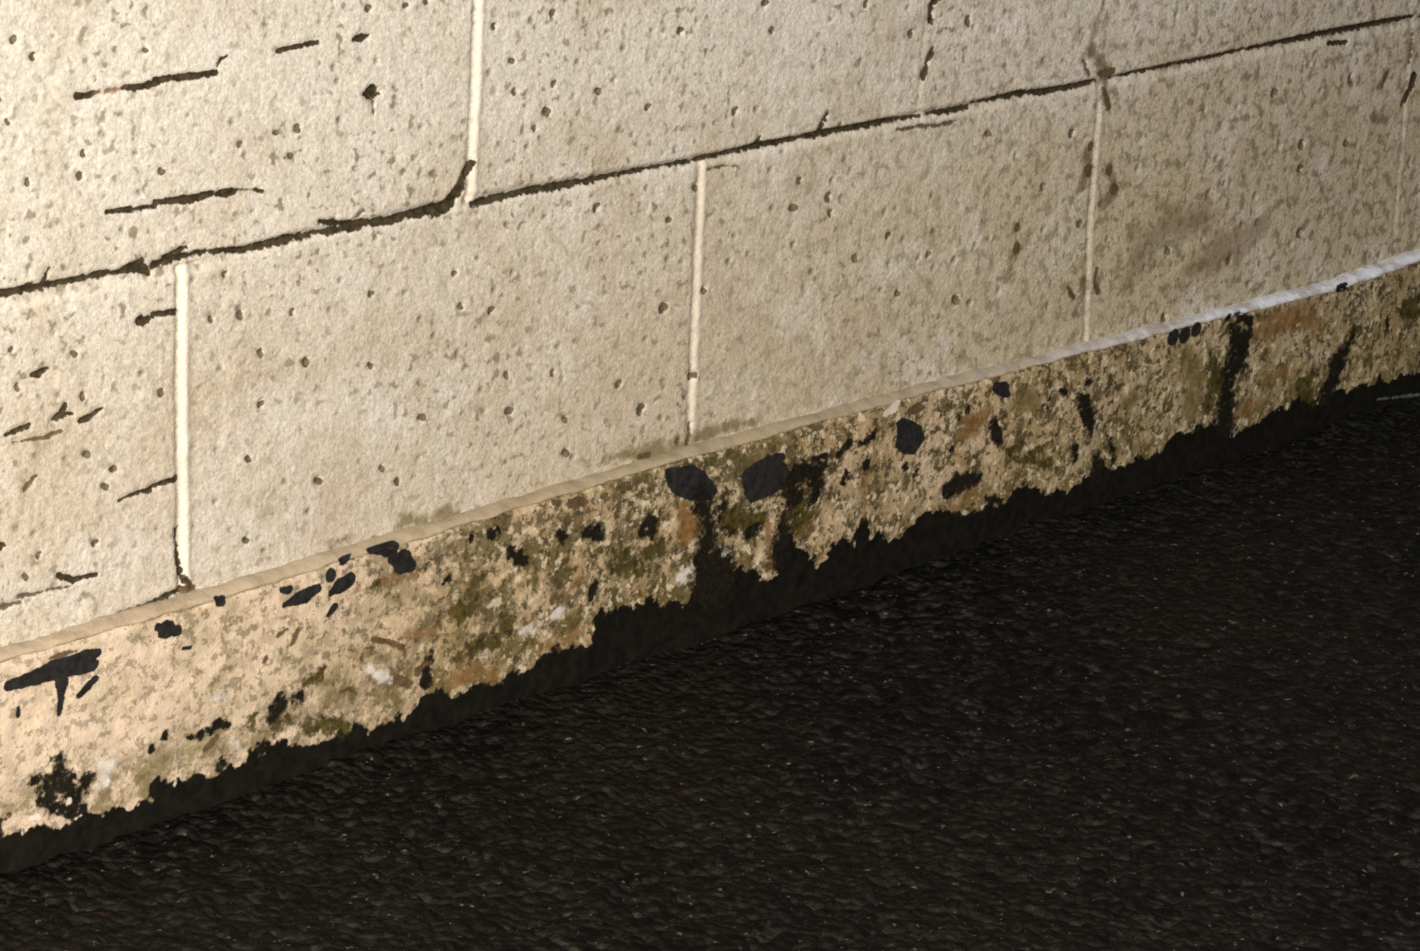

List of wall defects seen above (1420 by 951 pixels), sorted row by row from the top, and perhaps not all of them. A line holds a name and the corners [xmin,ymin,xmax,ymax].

crack [0,0,1420,298]
spalling [104,187,264,215]
water stain [1093,267,1101,295]
spalling [135,308,177,327]
water stain [1383,293,1420,332]
spalling [3,391,103,443]
peeling [665,464,741,614]
spalling [0,572,98,610]
peeling [279,540,416,617]
water stain [0,311,1420,873]
peeling [154,620,192,650]
peeling [3,649,102,718]